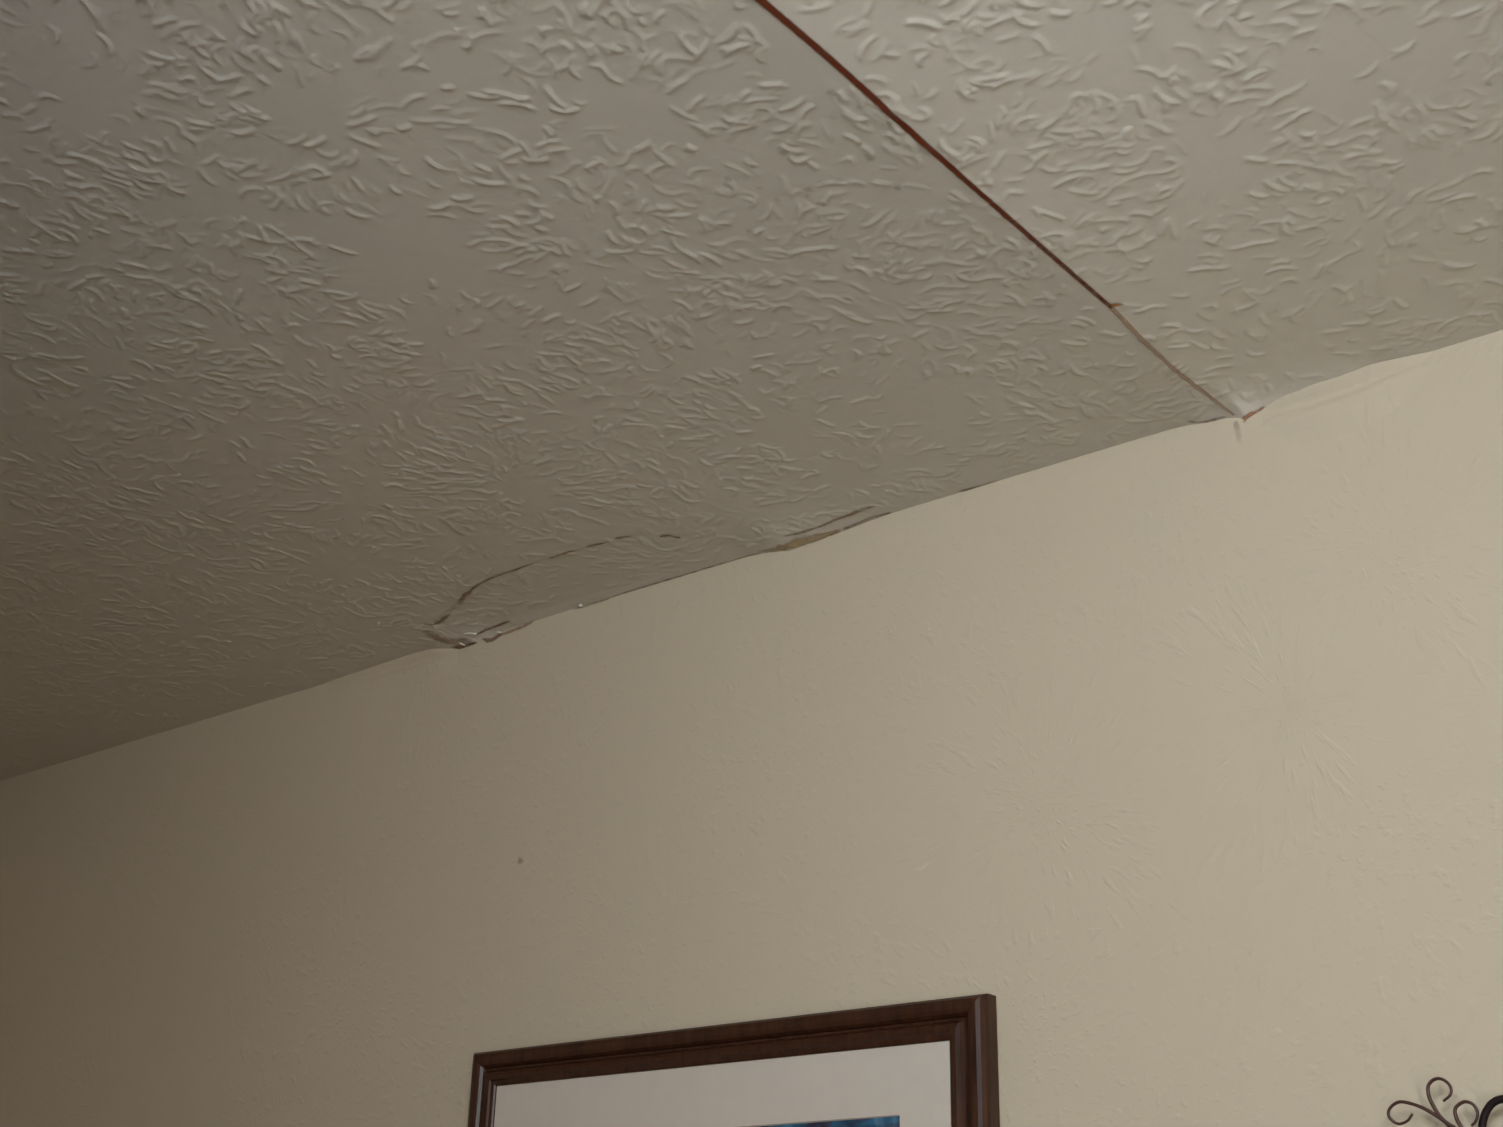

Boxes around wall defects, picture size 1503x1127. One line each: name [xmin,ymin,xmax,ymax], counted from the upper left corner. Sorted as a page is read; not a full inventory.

crack [755,0,1264,423]
peeling [770,507,890,551]
crack [432,537,624,625]